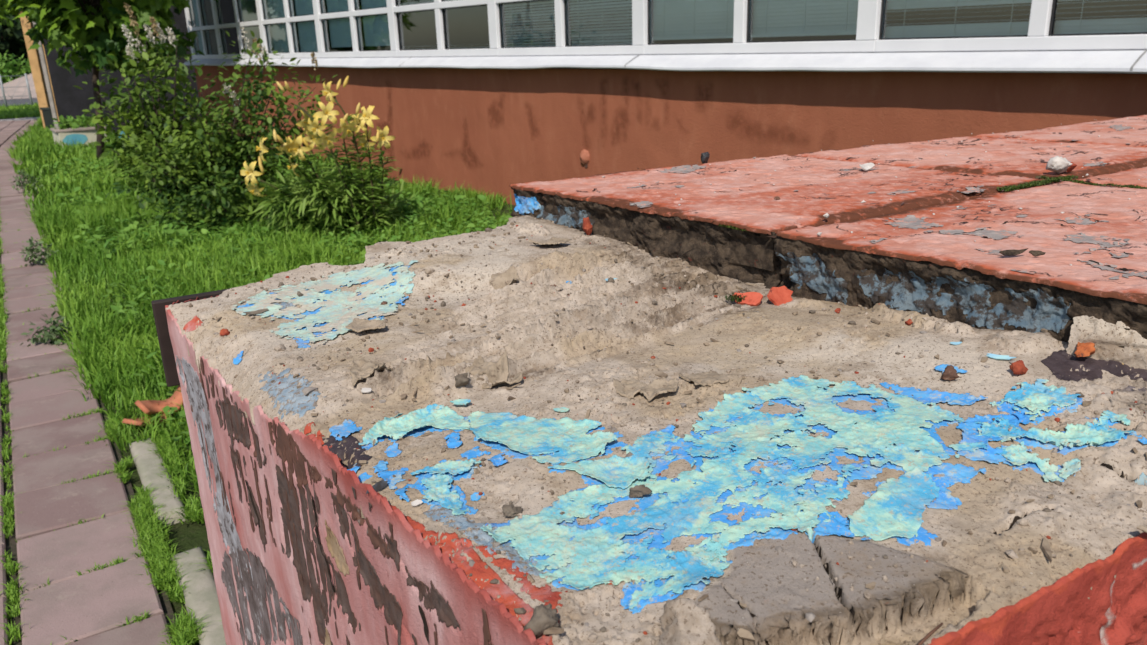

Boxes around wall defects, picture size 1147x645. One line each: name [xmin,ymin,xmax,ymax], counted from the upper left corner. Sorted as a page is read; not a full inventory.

peeling [1006,118,1147,197]
peeling [230,260,418,348]
spalling [489,265,520,290]
peeling [514,194,595,245]
peeling [775,252,1071,333]
peeling [829,138,1052,276]
peeling [1051,207,1147,283]
peeling [176,351,1147,645]
crack [816,546,856,625]